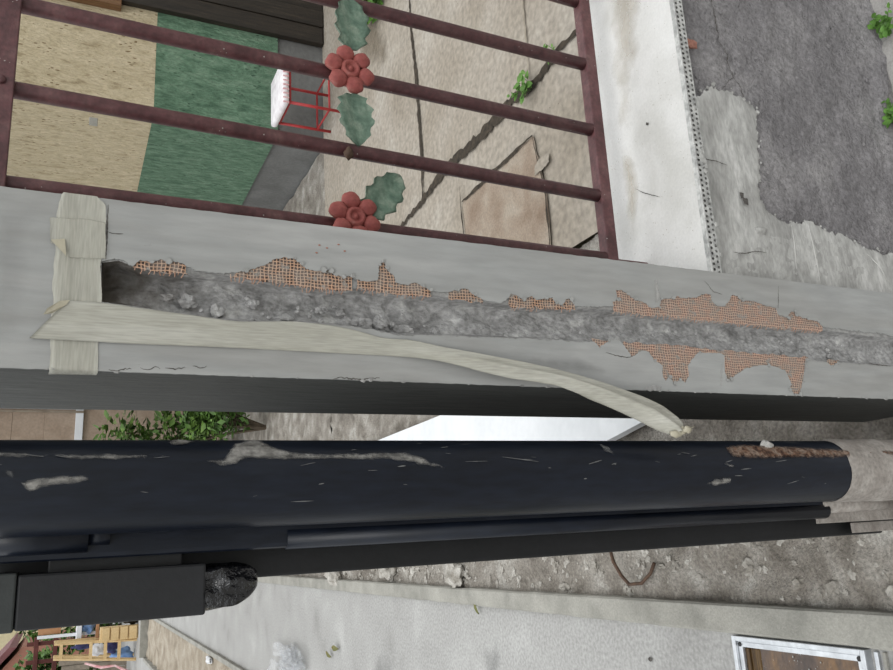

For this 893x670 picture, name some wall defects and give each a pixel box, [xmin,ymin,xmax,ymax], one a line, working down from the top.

crack [400,0,576,226]
spalling [133,258,188,278]
spalling [229,257,433,300]
spalling [448,288,483,304]
spalling [509,294,575,313]
spalling [612,290,823,334]
spalling [623,341,809,396]